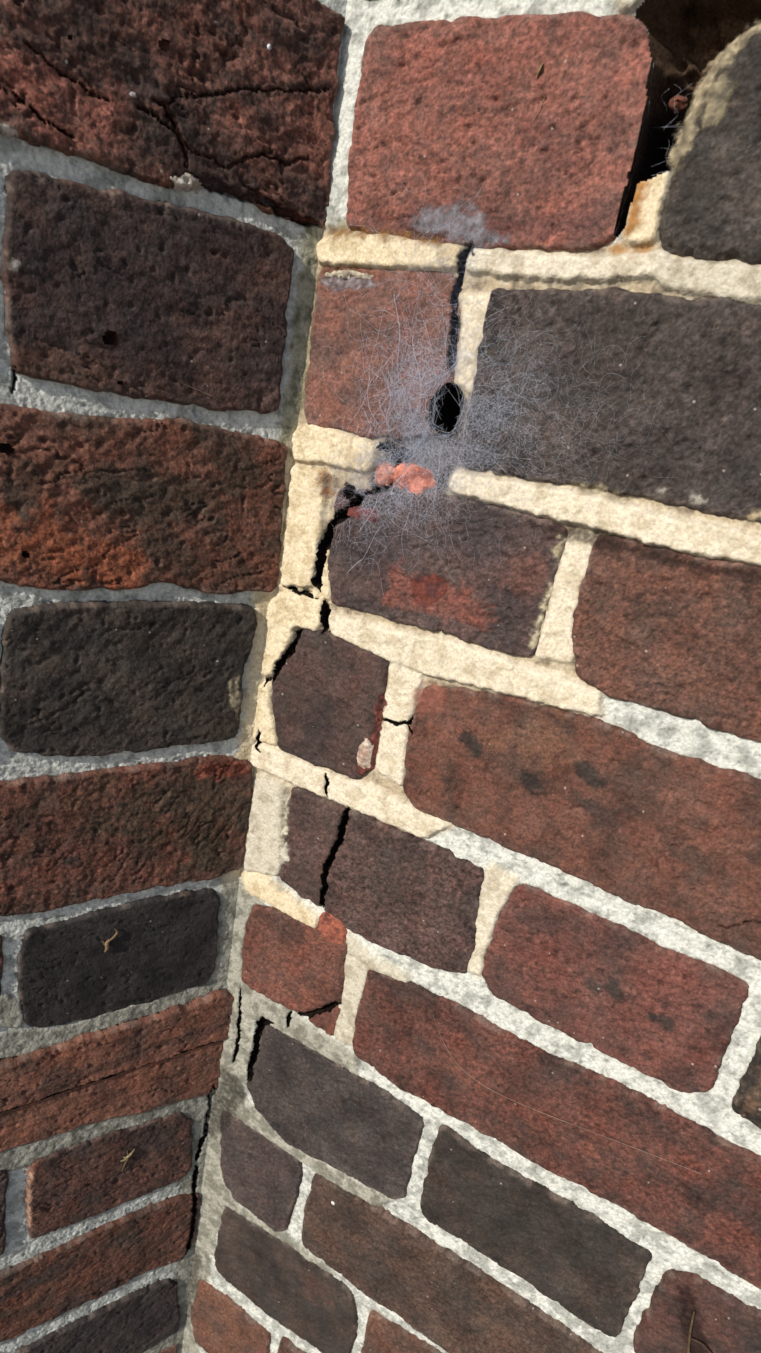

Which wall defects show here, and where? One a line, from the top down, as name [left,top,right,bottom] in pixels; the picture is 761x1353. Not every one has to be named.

crack [0,86,73,138]
crack [26,42,329,225]
spalling [613,0,761,237]
crack [448,244,474,374]
crack [264,453,404,687]
crack [253,729,261,753]
crack [319,773,351,909]
crack [0,989,342,1258]